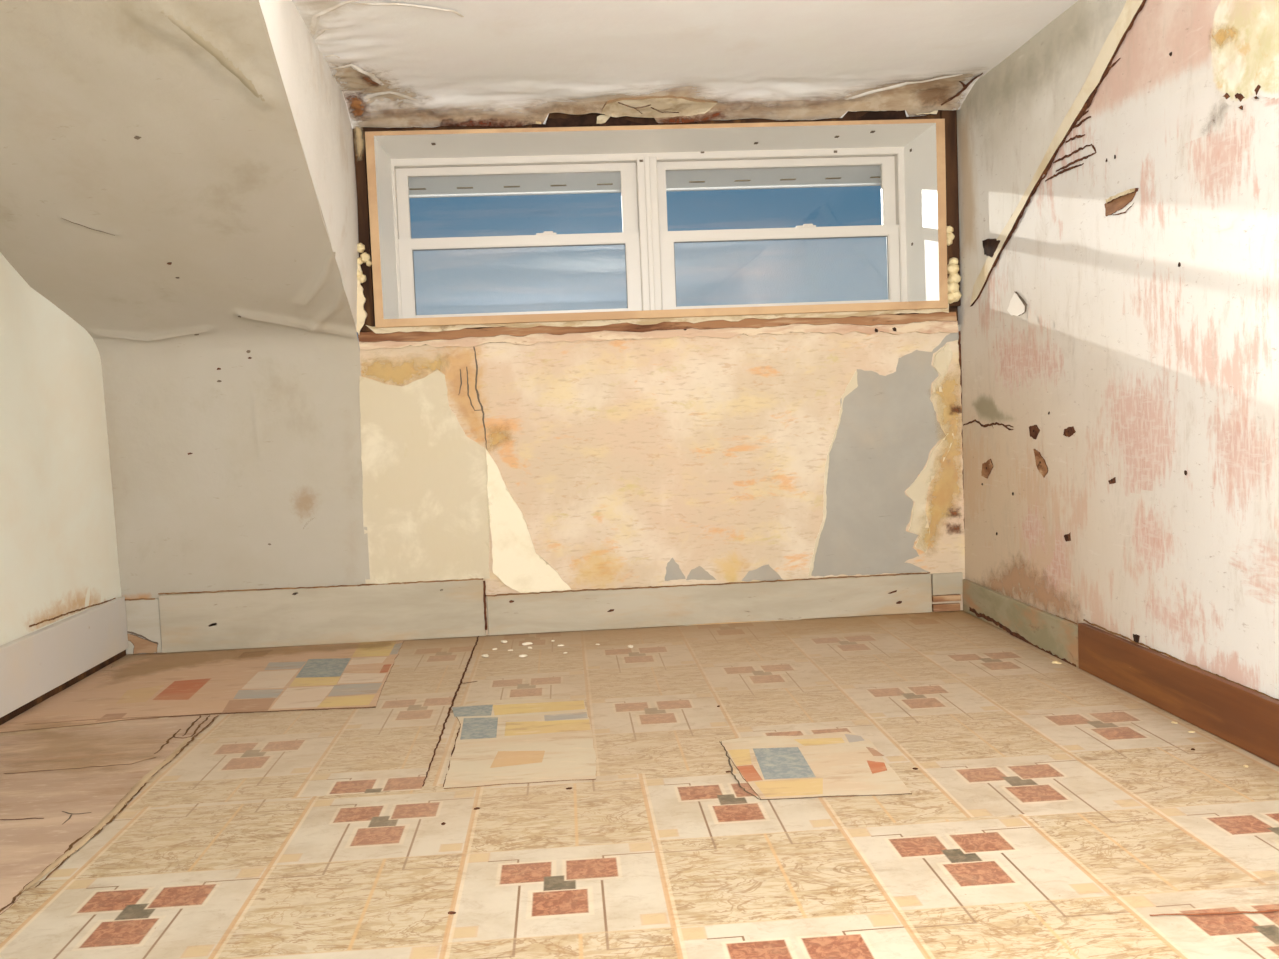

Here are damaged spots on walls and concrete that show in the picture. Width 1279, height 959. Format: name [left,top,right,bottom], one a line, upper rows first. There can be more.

spalling [532,114,648,128]
water stain [334,64,984,273]
peeling [1086,68,1268,232]
spalling [982,239,1000,257]
crack [458,347,487,449]
flaking render [808,325,960,577]
crack [963,419,1014,430]
peeling [989,292,1075,411]
flaking render [665,558,716,581]
flaking render [742,564,783,582]
peeling [1009,425,1079,618]